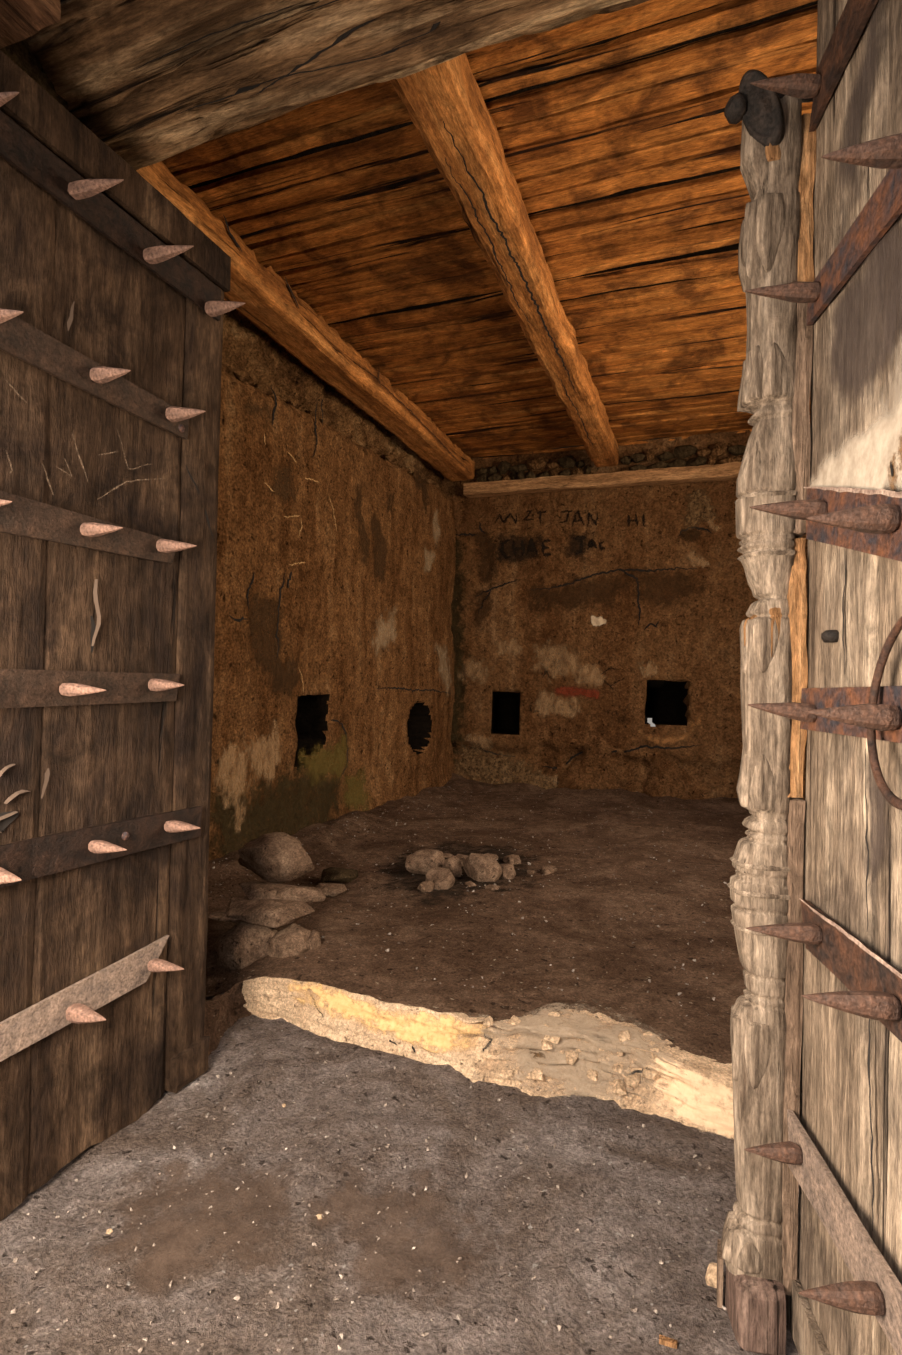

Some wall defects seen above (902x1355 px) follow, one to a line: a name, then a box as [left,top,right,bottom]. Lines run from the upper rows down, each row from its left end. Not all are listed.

crack [477,567,697,630]
water stain [209,764,340,856]